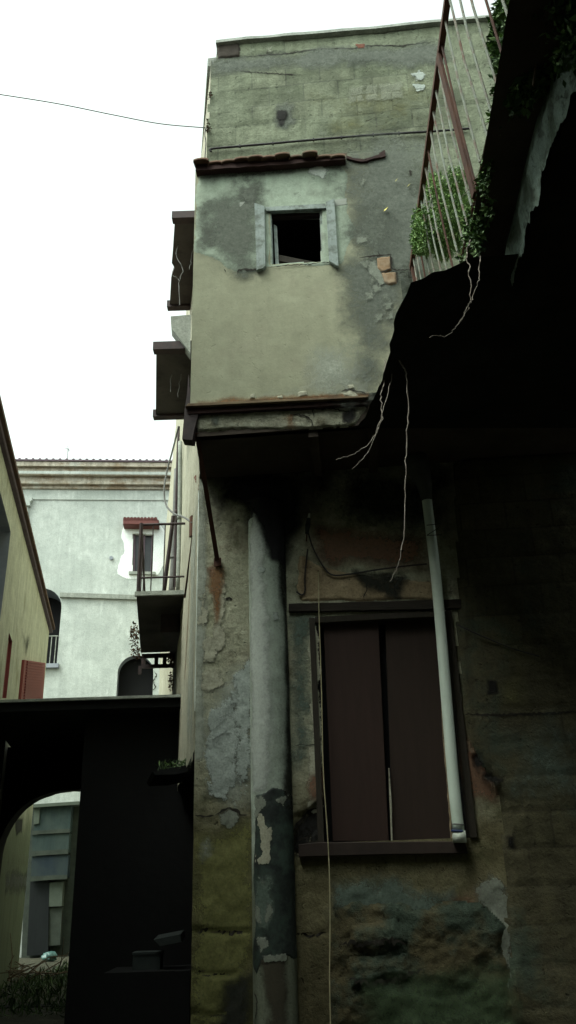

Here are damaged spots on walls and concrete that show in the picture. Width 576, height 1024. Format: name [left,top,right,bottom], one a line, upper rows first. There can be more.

spalling [350,70,425,101]
leakage [197,137,436,392]
spalling [359,257,397,320]
rust [209,566,224,621]
peeling [197,580,324,974]